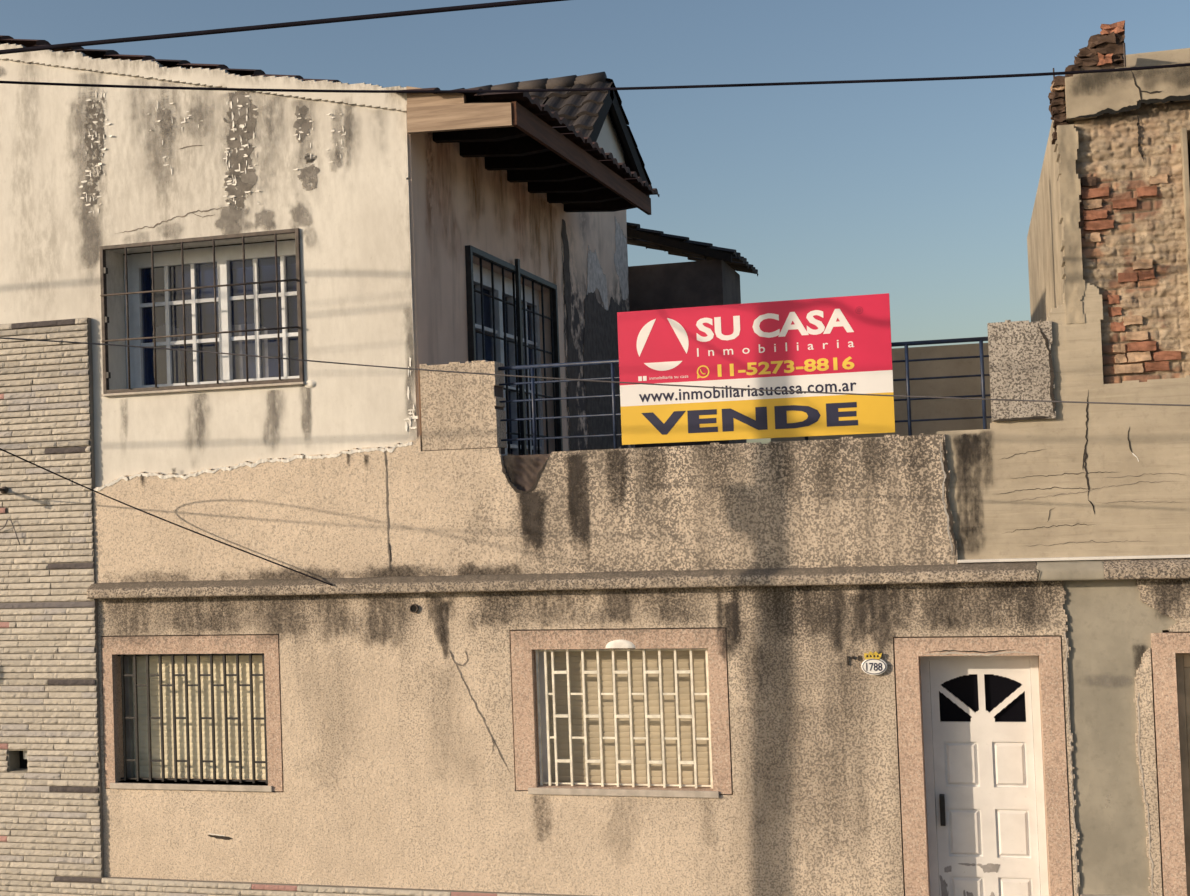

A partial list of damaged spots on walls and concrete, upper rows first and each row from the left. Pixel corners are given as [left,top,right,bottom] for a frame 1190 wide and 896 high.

peeling [73,89,112,264]
peeling [222,91,260,210]
spalling [1081,174,1168,242]
crack [1071,70,1190,161]
spalling [1107,259,1182,374]
water stain [519,492,545,548]
water stain [568,455,589,544]
crack [1001,390,1188,547]
water stain [431,597,468,666]
water stain [717,593,739,654]
crack [452,658,508,769]
peeling [940,863,1000,896]